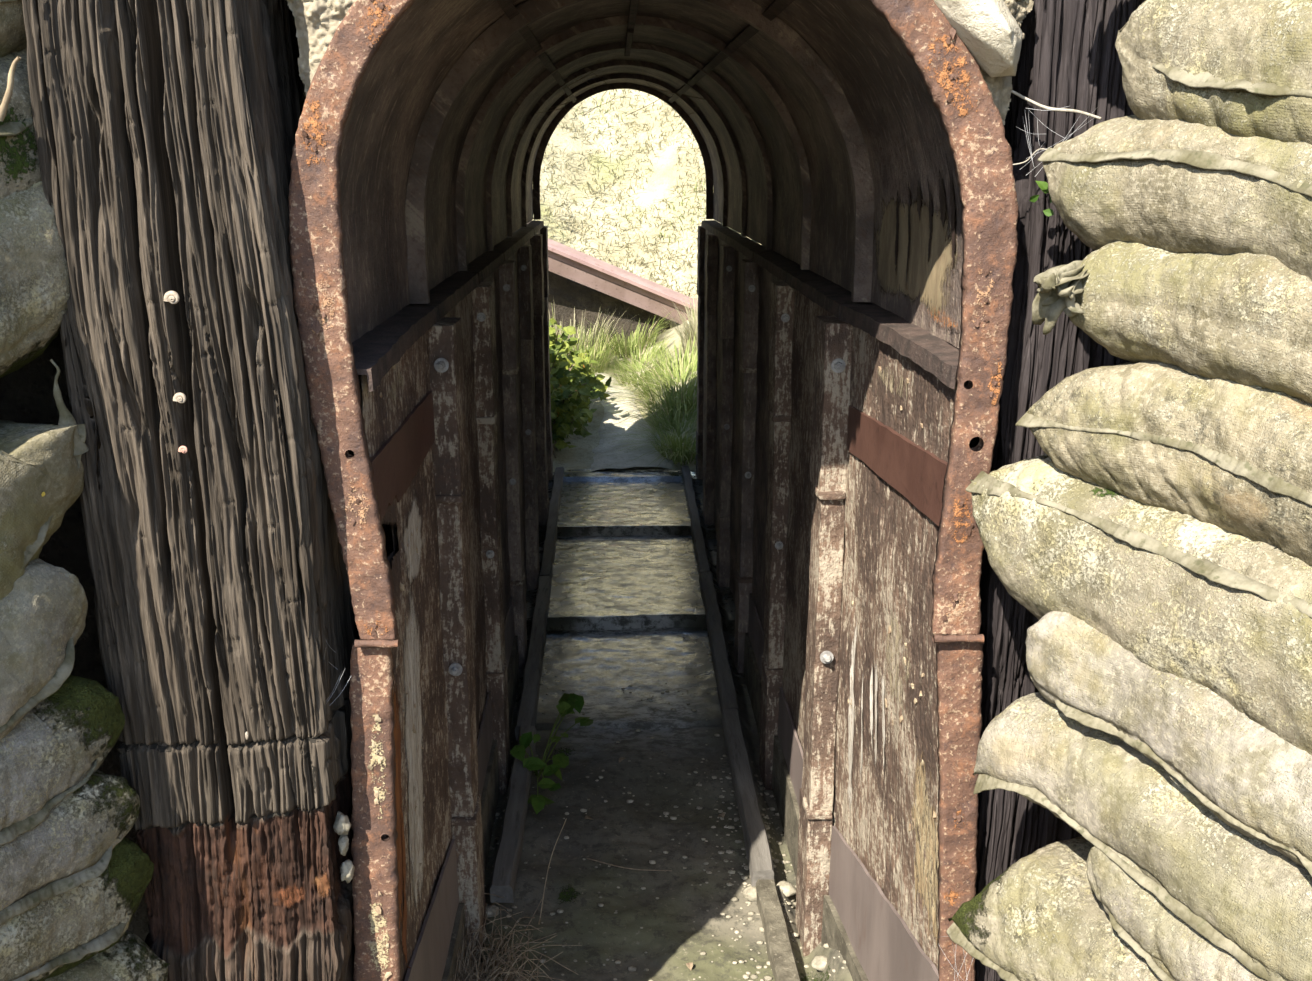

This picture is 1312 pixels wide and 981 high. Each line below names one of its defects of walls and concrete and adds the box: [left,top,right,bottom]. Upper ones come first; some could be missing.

corrosion [357,0,394,48]
corrosion [925,27,978,123]
corrosion [296,95,330,166]
corrosion [987,358,1002,405]
corrosion [951,491,974,553]
corrosion [392,685,411,968]